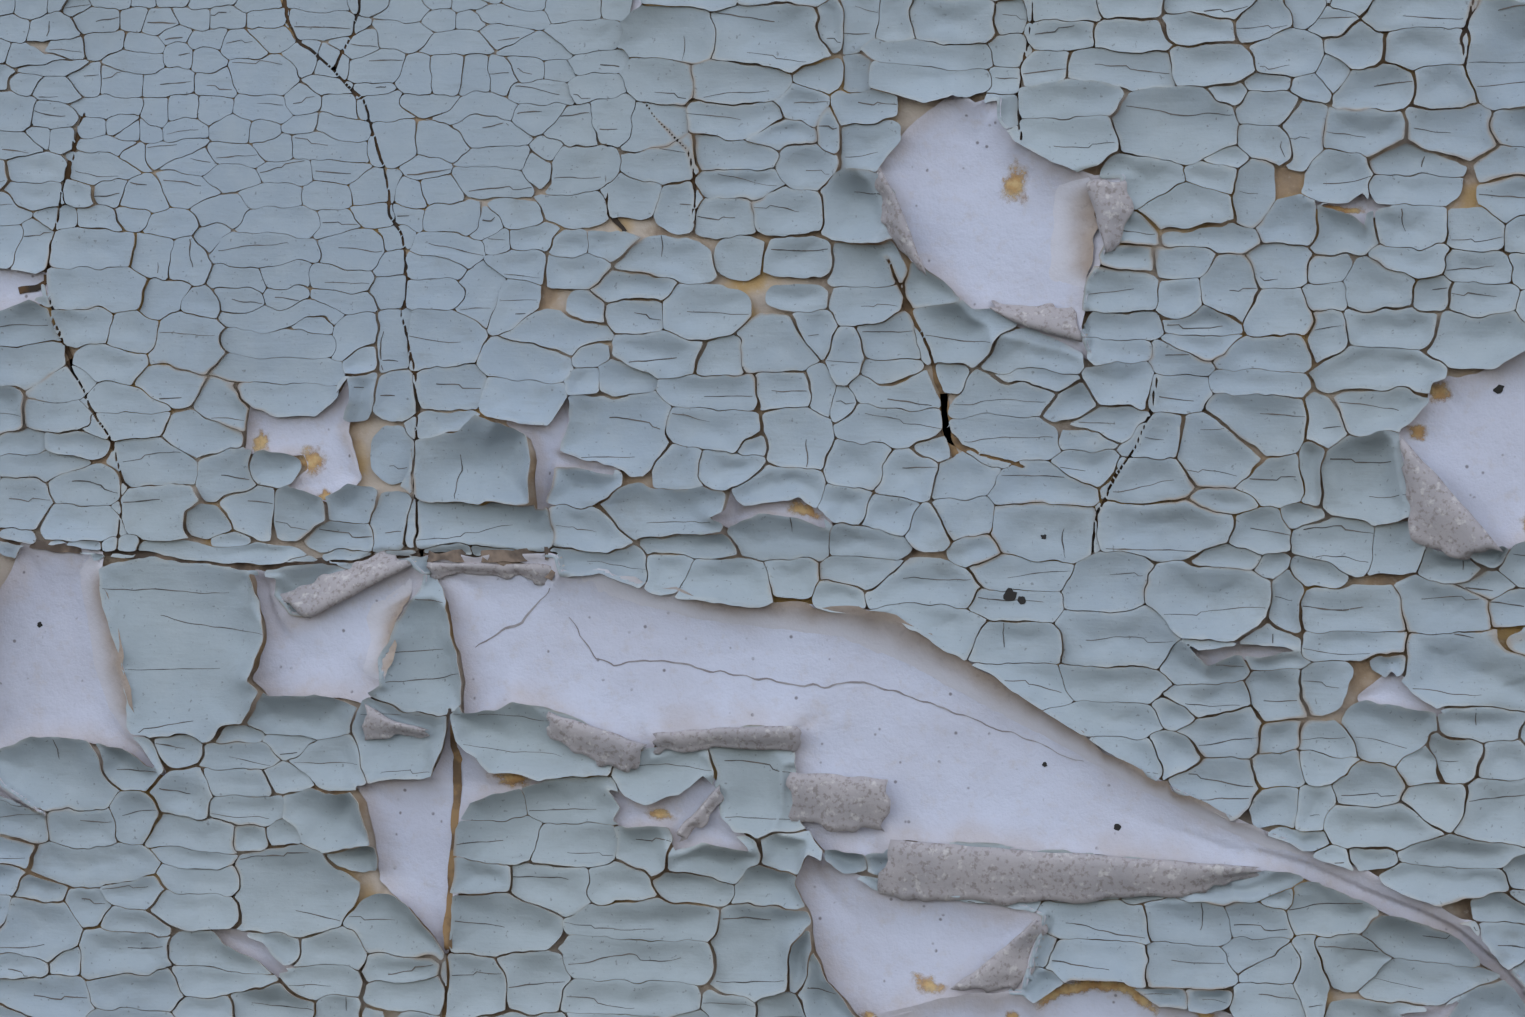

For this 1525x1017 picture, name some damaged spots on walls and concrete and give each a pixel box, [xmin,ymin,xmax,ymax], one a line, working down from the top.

crack [282,0,420,441]
peeling [0,0,844,281]
peeling [821,0,1124,243]
crack [1017,3,1035,140]
peeling [1021,0,1525,279]
crack [1460,0,1476,69]
peeling [0,151,752,1017]
crack [0,102,1082,761]
peeling [79,241,1525,1017]
crack [1092,381,1158,552]
peeling [875,95,1525,721]
crack [442,712,462,1017]